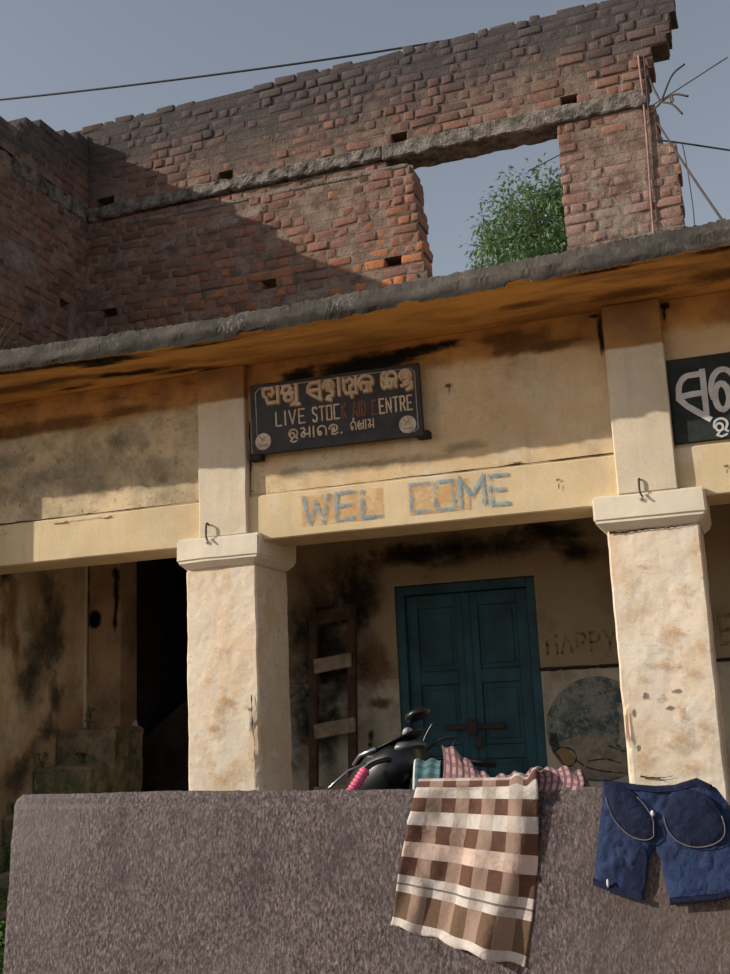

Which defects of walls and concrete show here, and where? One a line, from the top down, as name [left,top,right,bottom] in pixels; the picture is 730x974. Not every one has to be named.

damp [482,332,575,355]
damp [0,416,93,439]
damp [1,574,63,700]